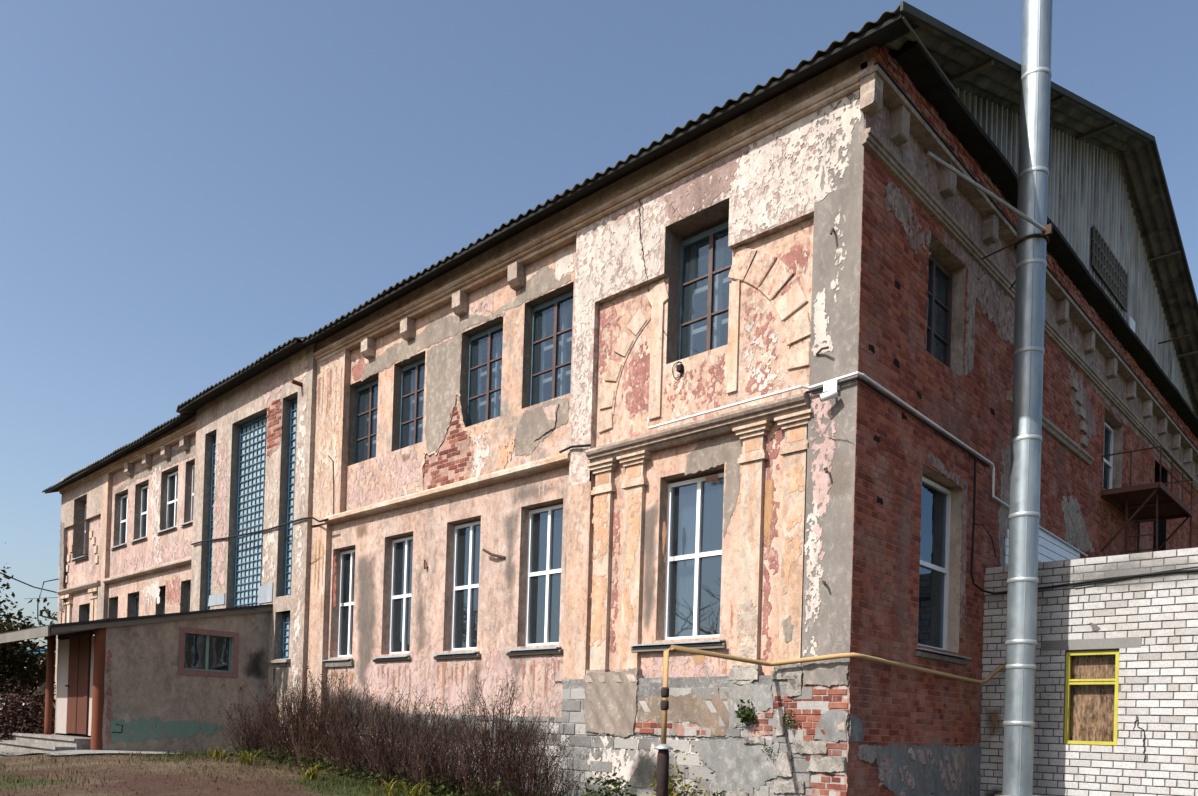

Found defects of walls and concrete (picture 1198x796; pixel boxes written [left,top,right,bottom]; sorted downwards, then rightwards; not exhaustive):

peeling [555,89,862,442]
flaking render [262,350,515,694]
peeling [587,392,850,796]
peeling [873,744,982,796]
crack [1133,716,1146,762]